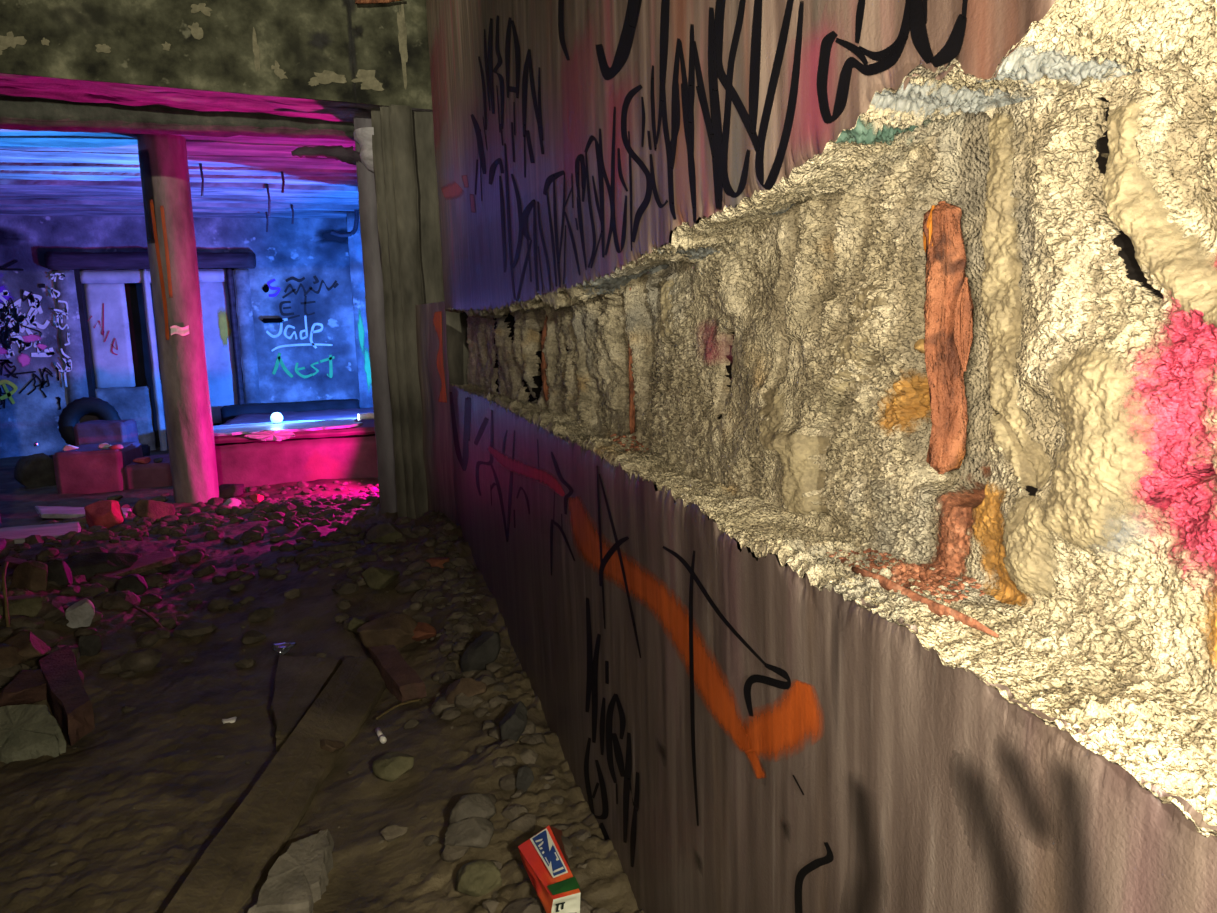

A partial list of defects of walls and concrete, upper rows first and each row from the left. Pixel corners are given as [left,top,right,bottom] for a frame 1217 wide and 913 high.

spalling [444,0,1217,838]
rust [851,201,1026,638]
crack [1095,97,1110,176]
crack [1112,229,1164,302]